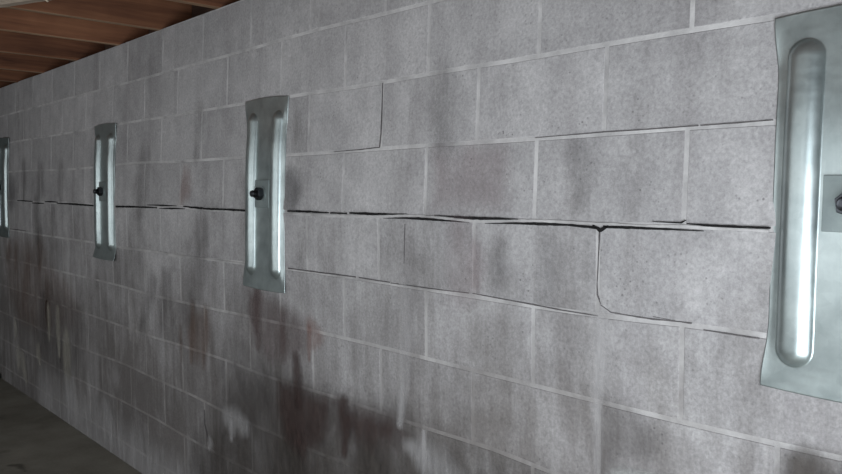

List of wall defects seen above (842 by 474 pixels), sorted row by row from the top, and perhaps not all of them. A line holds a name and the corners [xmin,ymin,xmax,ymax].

crack [17,199,94,207]
crack [115,204,245,212]
crack [287,210,771,339]